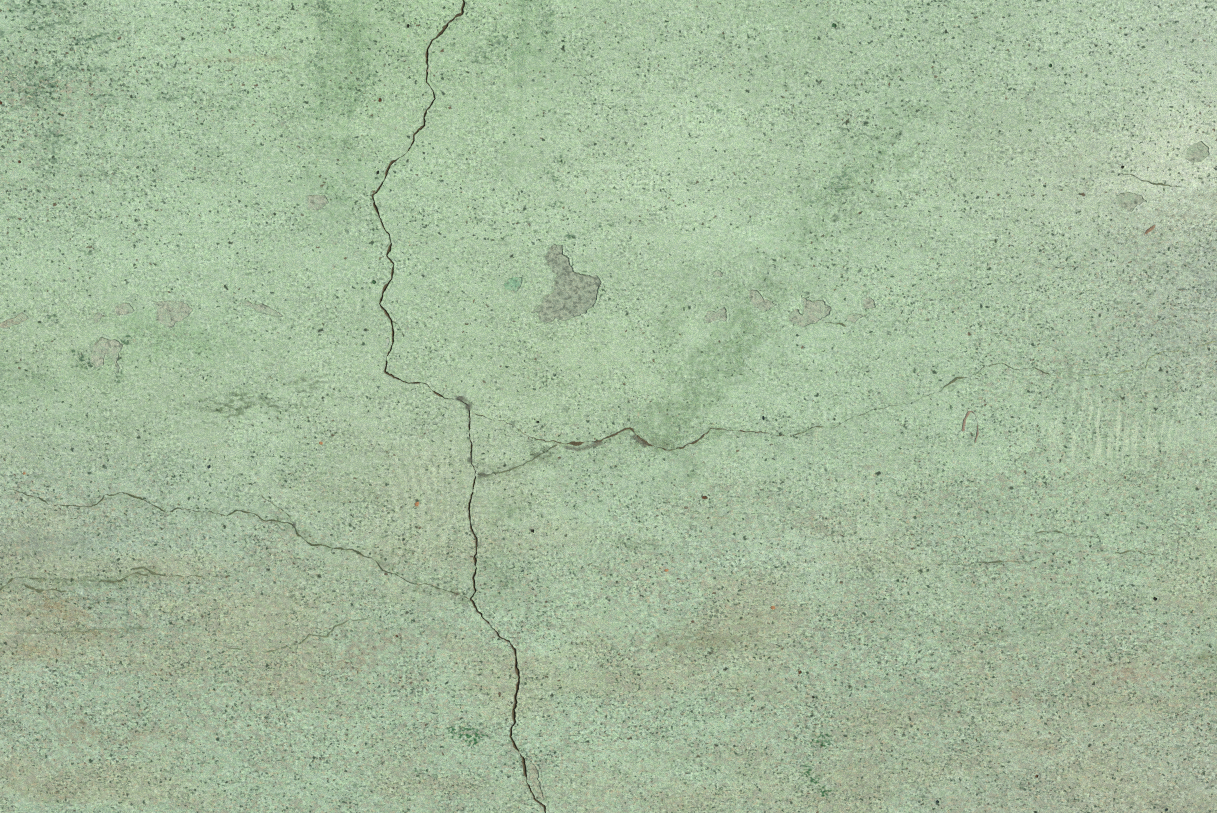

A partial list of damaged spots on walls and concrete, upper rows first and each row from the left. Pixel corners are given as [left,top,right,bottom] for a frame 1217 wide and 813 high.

crack [0,0,896,813]
peeling [529,242,604,326]